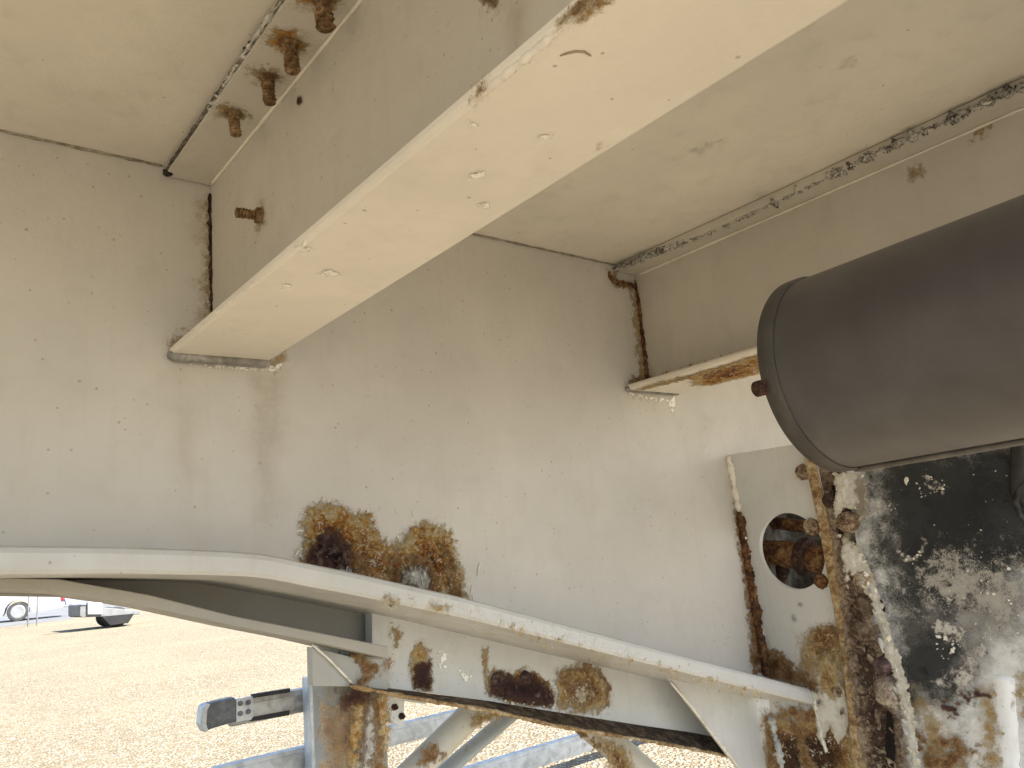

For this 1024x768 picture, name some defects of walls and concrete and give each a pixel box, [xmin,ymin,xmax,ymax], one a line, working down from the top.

corrosion [556,0,611,26]
corrosion [266,28,307,54]
corrosion [216,105,251,119]
corrosion [636,355,760,390]
corrosion [294,497,481,616]
corrosion [620,485,1004,768]
corrosion [317,626,404,768]
corrosion [408,642,433,693]
corrosion [481,644,612,715]